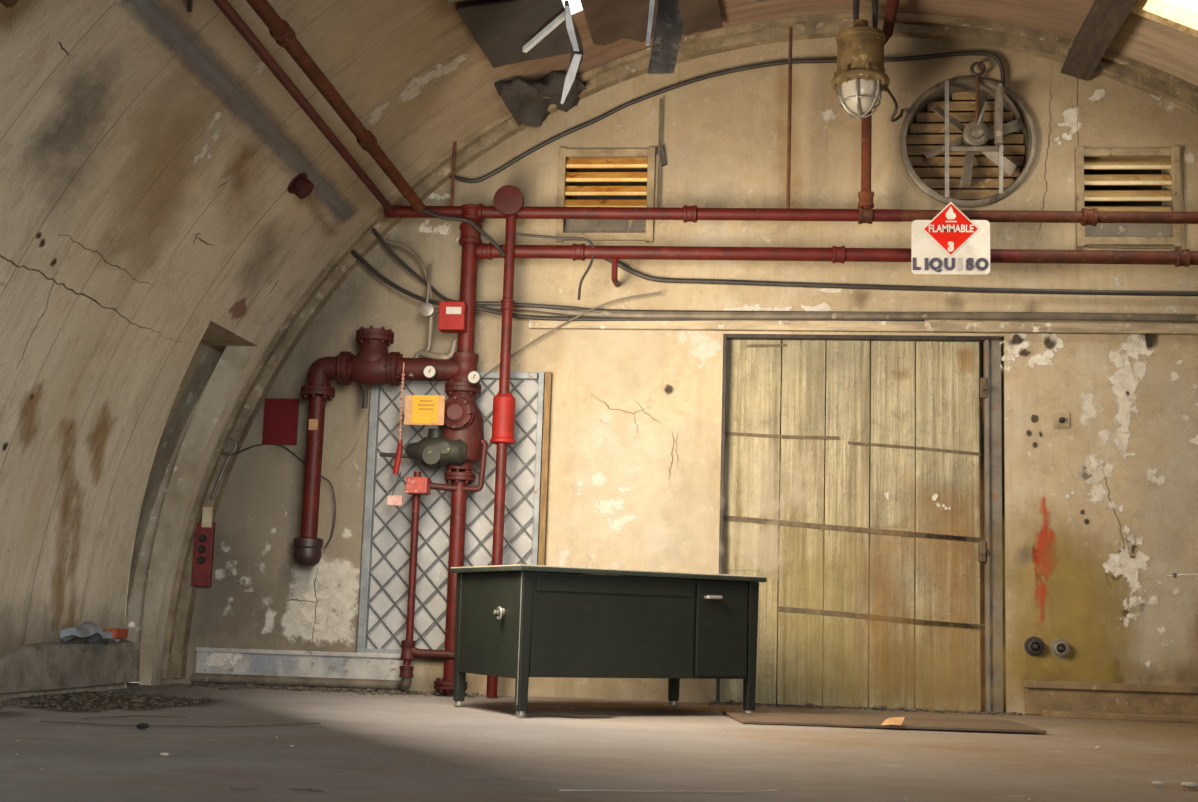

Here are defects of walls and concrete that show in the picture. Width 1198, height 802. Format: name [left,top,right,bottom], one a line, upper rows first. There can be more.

crack [62,235,157,288]
crack [0,254,176,369]
rust [23,390,40,442]
rust [92,416,108,476]
peeling [1065,335,1187,627]